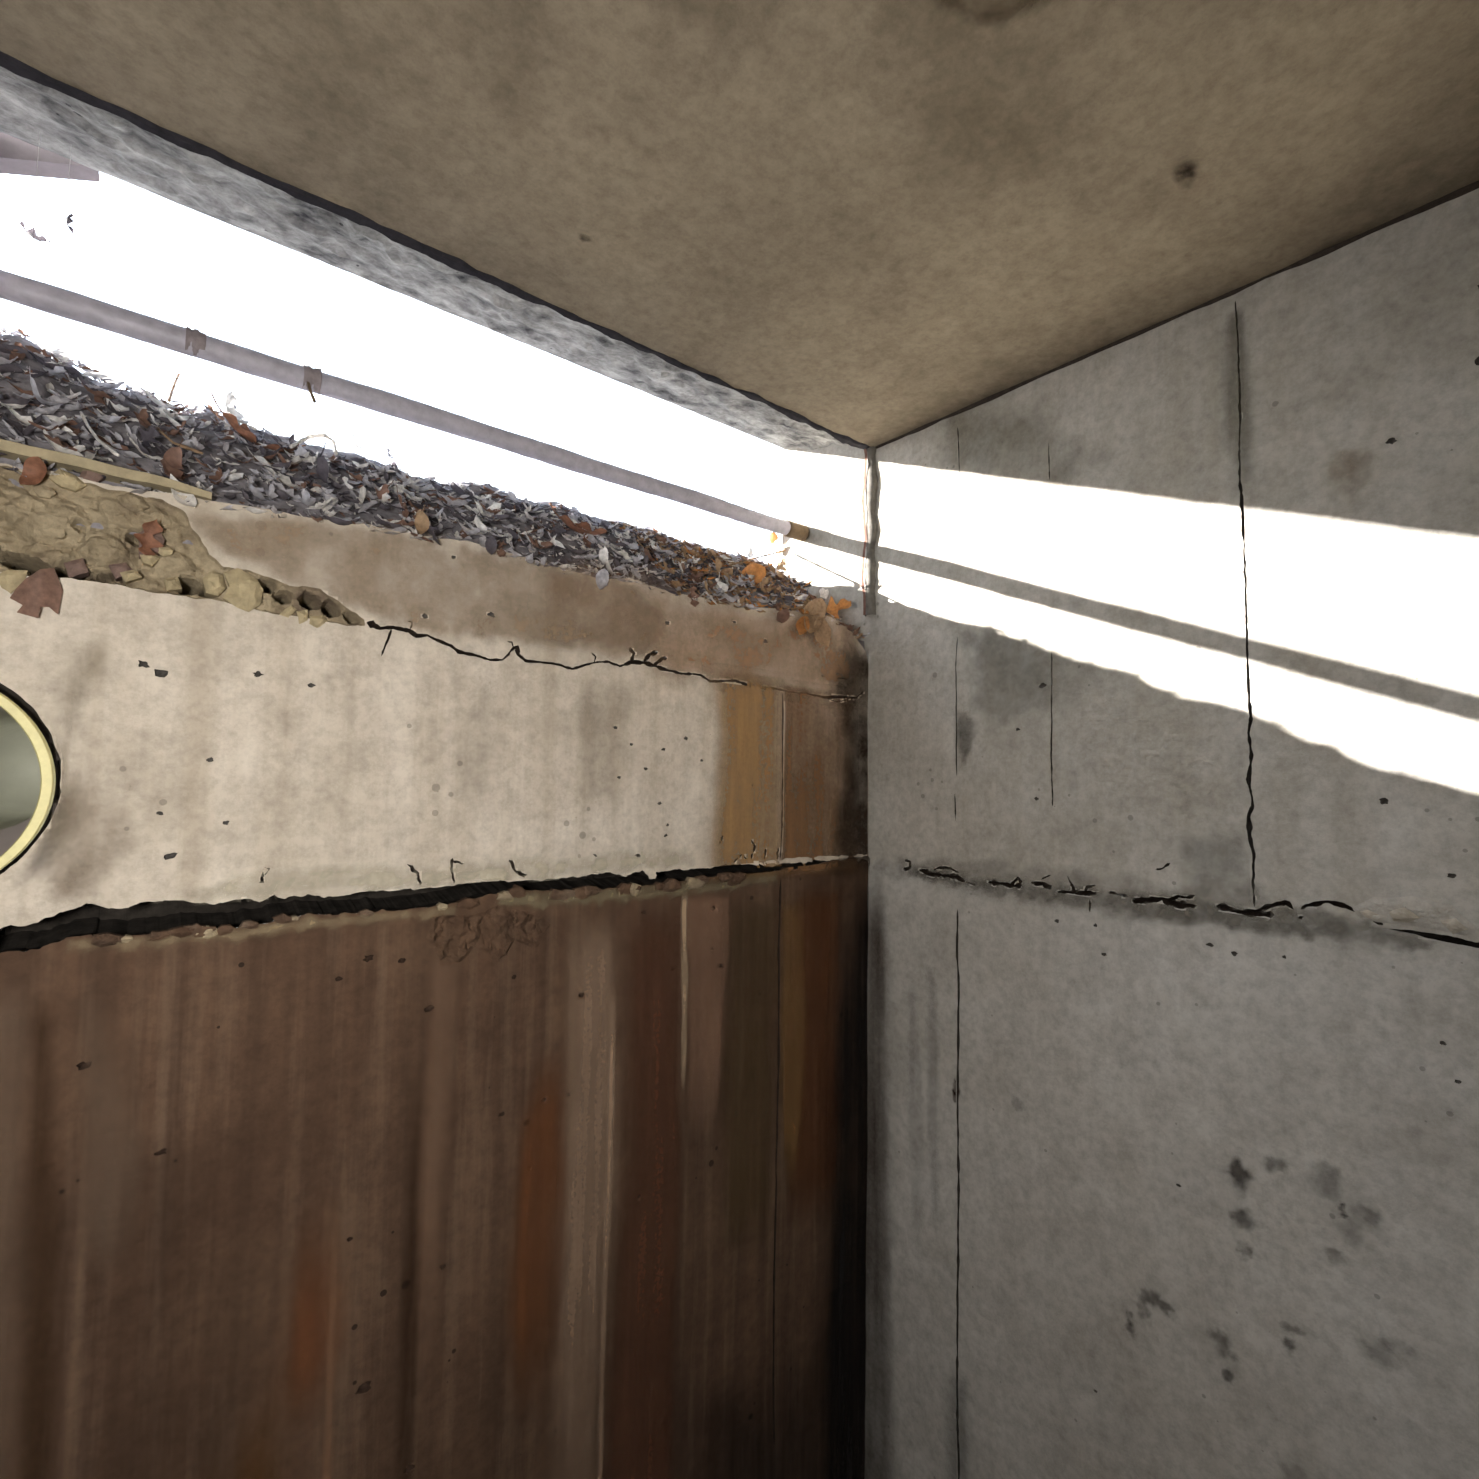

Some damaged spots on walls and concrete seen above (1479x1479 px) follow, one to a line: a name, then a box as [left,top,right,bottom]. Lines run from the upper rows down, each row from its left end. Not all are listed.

spalling [0,466,365,628]
crack [0,620,864,1443]
corrosion [717,676,857,874]
crack [903,301,1479,1479]